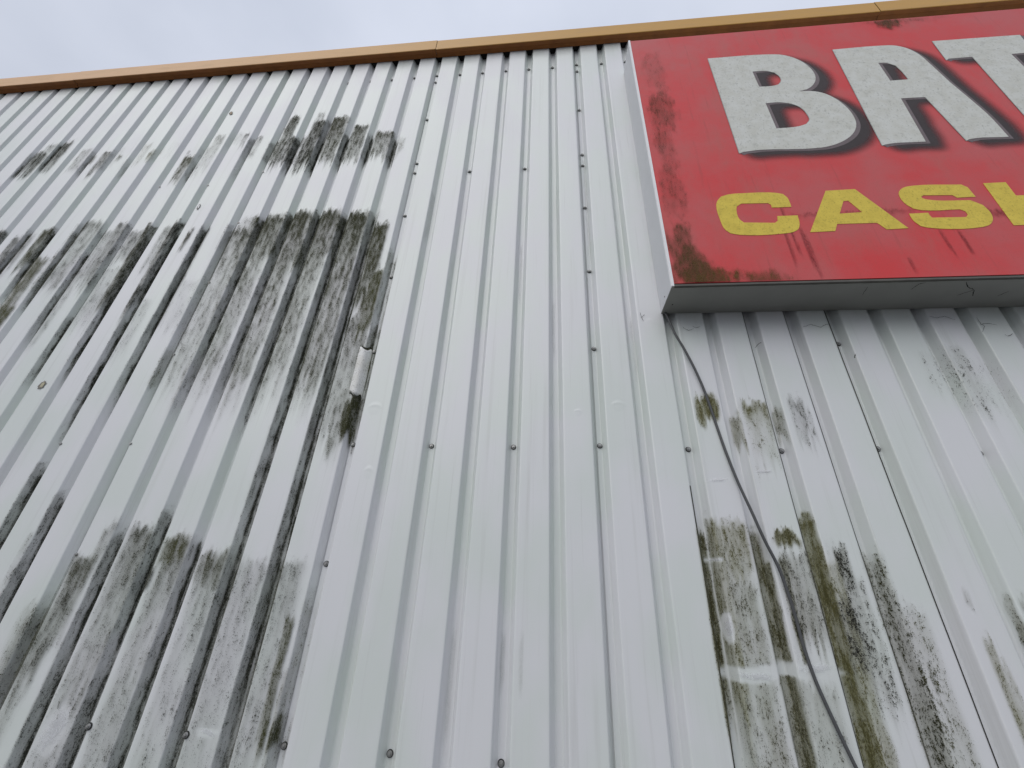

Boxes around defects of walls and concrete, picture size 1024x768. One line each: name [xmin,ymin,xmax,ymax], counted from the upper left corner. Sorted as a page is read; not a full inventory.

damp [237,115,405,177]
damp [667,224,794,282]
damp [696,392,719,430]
damp [731,396,817,475]
damp [0,208,395,768]
damp [696,512,981,768]
damp [982,636,1024,738]